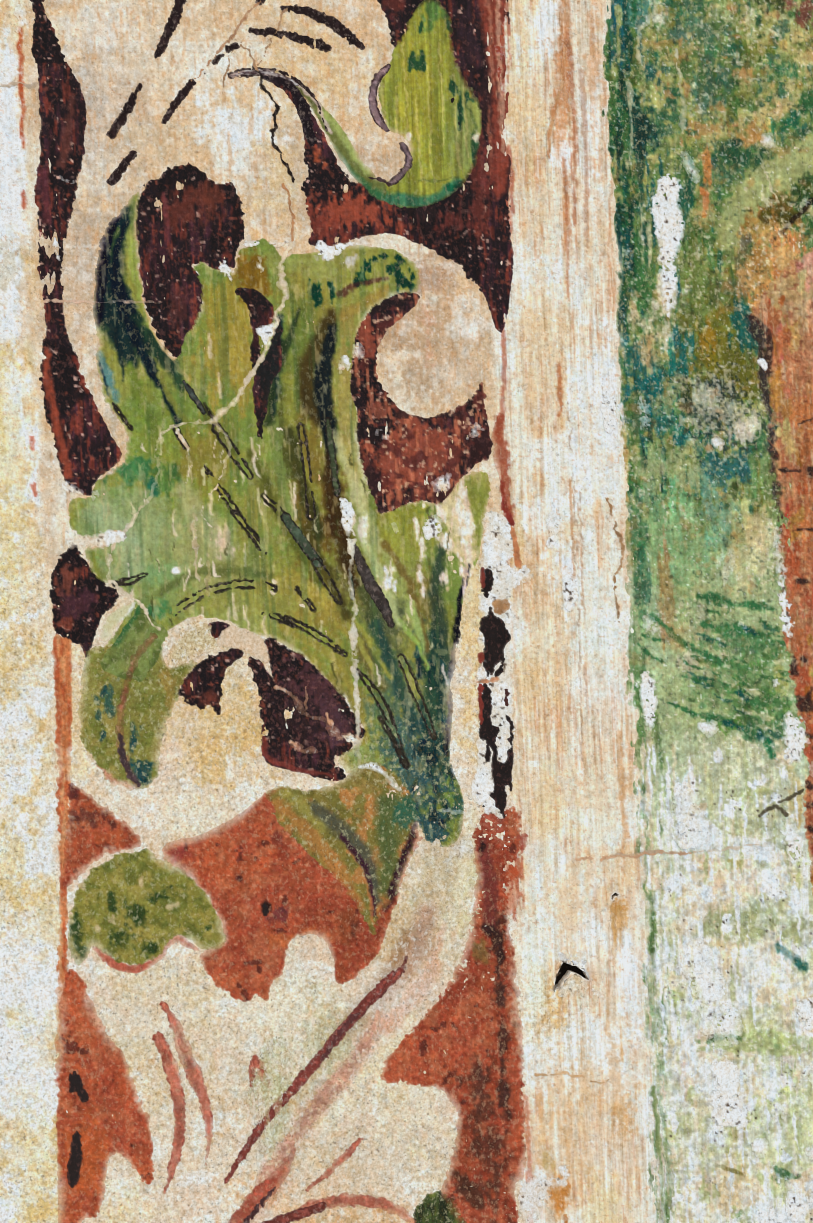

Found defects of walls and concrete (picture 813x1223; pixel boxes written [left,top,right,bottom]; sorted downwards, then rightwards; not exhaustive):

crack [105,0,295,631]
peeling [430,473,452,493]
spalling [438,413,534,819]
peeling [649,151,700,319]